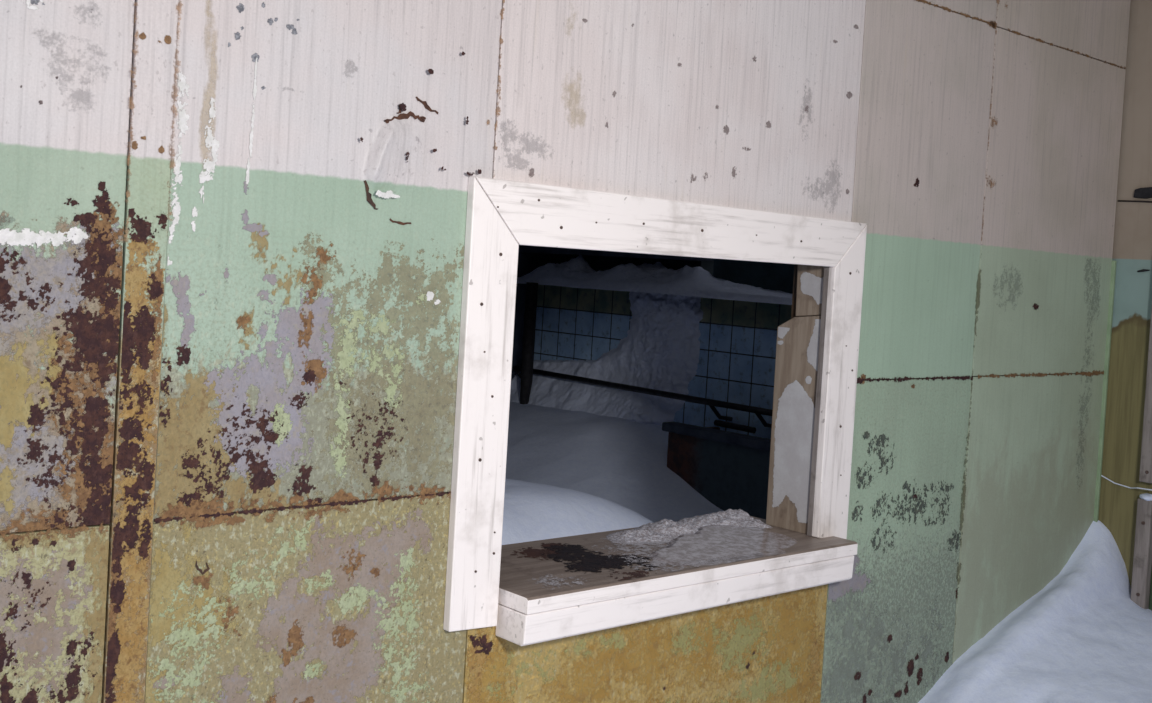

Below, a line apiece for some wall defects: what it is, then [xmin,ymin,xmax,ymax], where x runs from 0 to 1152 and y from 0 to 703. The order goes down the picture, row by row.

corrosion [129,2,183,168]
corrosion [916,0,1126,69]
peeling [0,211,124,533]
peeling [166,72,220,349]
corrosion [0,126,451,703]
peeling [148,232,464,703]
peeling [772,319,821,523]
peeling [800,272,823,305]
corrosion [857,370,1104,545]
peeling [0,548,93,703]
corrosion [894,653,923,698]